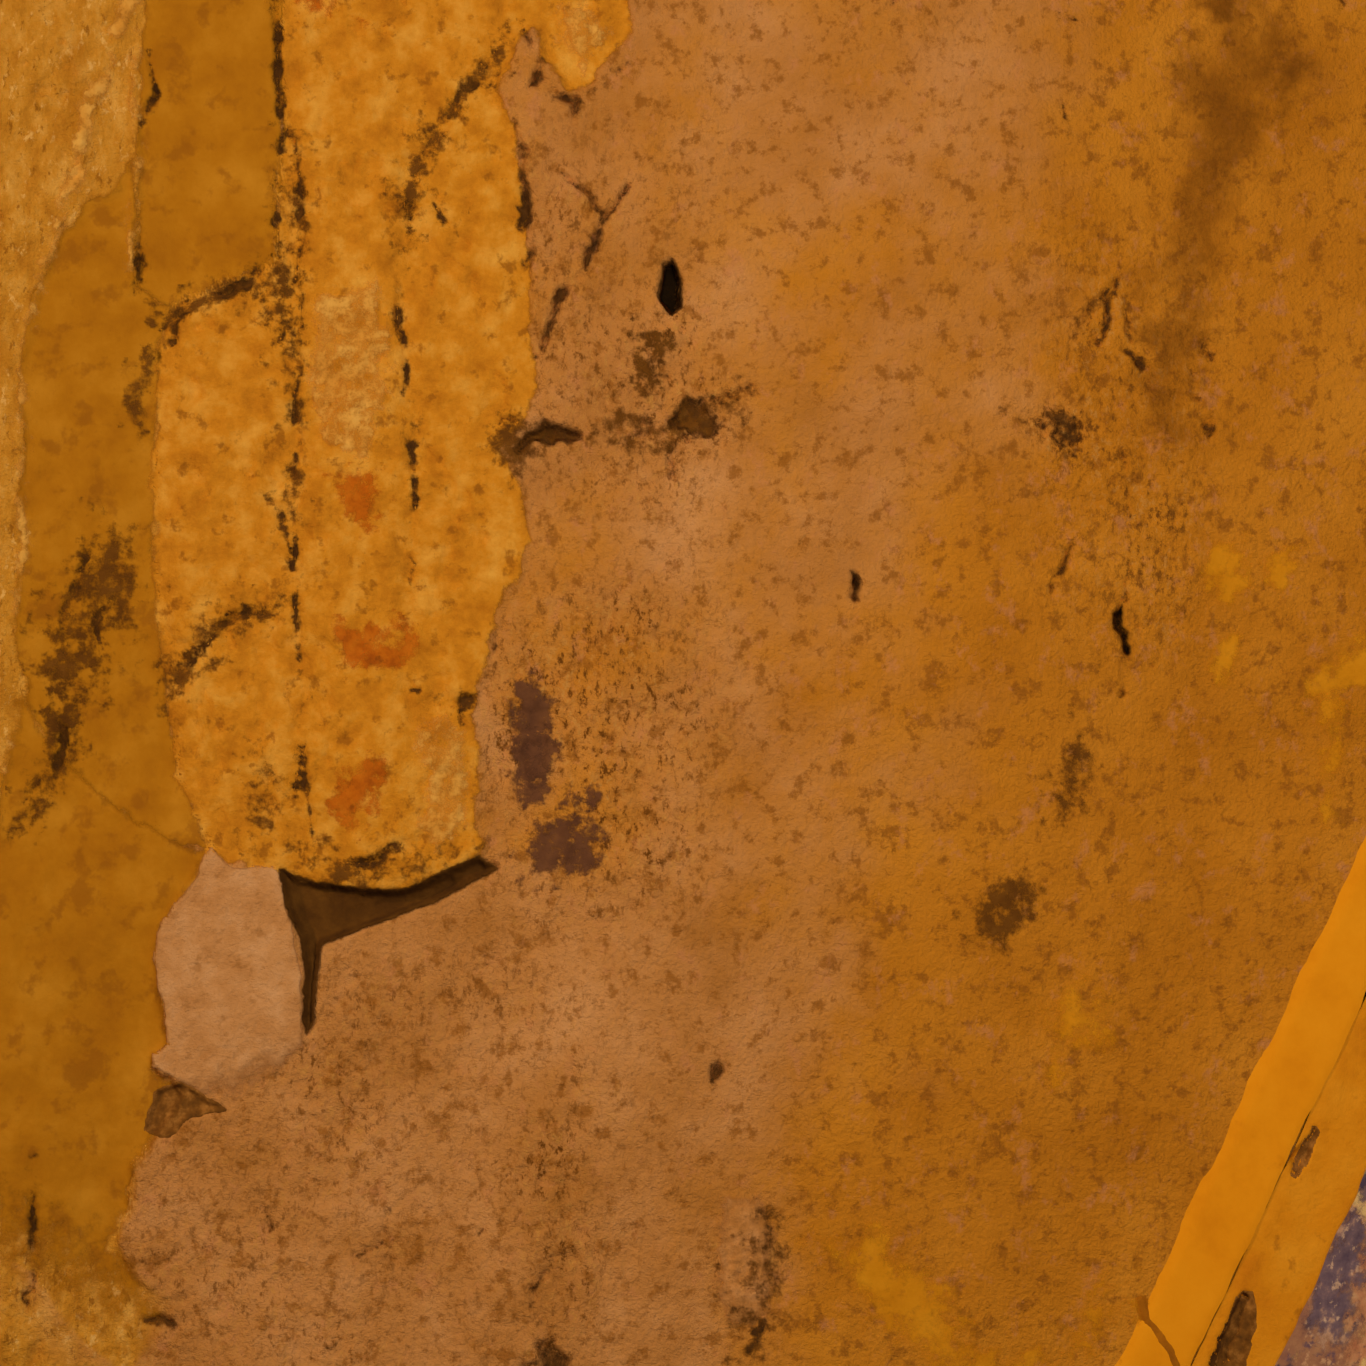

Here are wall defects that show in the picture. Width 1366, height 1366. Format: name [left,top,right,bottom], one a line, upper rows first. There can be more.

crack [515,122,535,268]
crack [535,173,628,358]
spalling [658,260,682,314]
crack [159,8,308,680]
spalling [668,386,755,473]
spalling [0,0,633,1326]
crack [292,745,314,834]
leakage [506,670,607,889]
leakage [976,869,1043,956]
spalling [710,1060,723,1083]
crack [1285,1126,1320,1179]
crack [1135,1290,1257,1366]